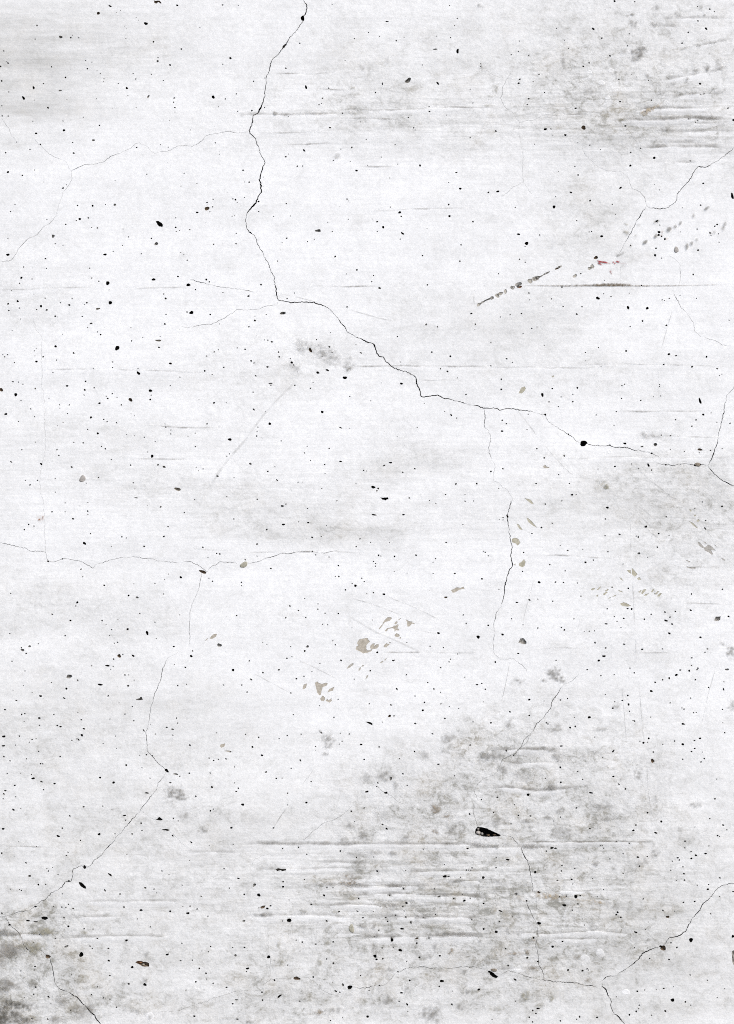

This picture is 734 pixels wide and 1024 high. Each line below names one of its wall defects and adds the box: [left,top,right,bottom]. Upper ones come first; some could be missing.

crack [2,1,733,666]
crack [1,493,333,1024]
crack [308,835,734,1024]